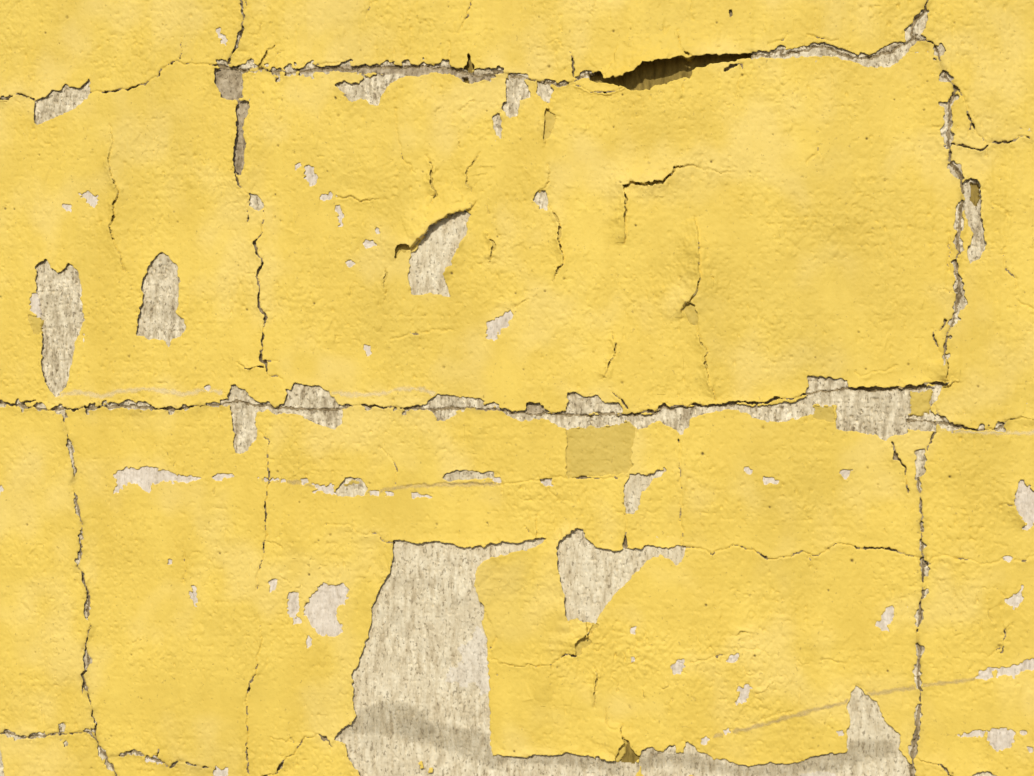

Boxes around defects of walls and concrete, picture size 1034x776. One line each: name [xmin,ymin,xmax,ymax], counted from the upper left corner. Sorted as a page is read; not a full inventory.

crack [0,93,37,103]
crack [90,0,620,93]
peeling [28,259,85,397]
peeling [136,252,186,347]
crack [235,172,278,377]
peeling [363,187,476,297]
crack [724,0,1031,365]
peeling [227,383,343,454]
peeling [526,375,942,514]
peeling [287,582,349,648]
crack [0,381,1034,776]
peeling [334,526,914,776]